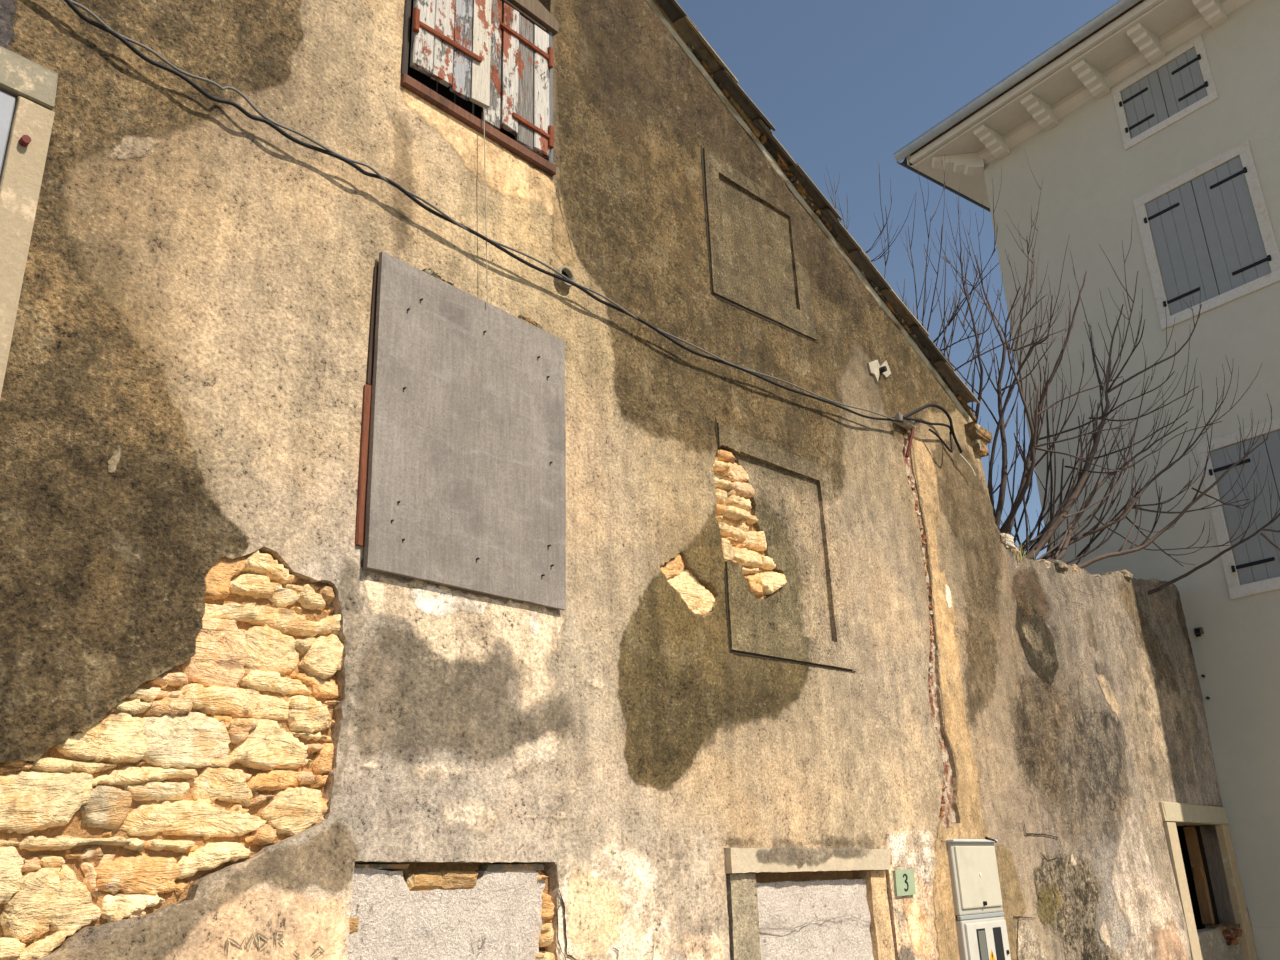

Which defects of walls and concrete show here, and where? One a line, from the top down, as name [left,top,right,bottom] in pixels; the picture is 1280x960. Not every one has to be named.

leakage [0,0,304,762]
spalling [0,550,344,960]
leakage [332,559,569,796]
leakage [444,801,500,832]
crack [556,889,577,960]
peeling [535,838,725,960]
leakage [404,0,958,494]
spalling [660,553,715,616]
leakage [618,504,809,790]
spalling [713,449,787,599]
crack [902,434,956,828]
leakage [1013,576,1198,960]